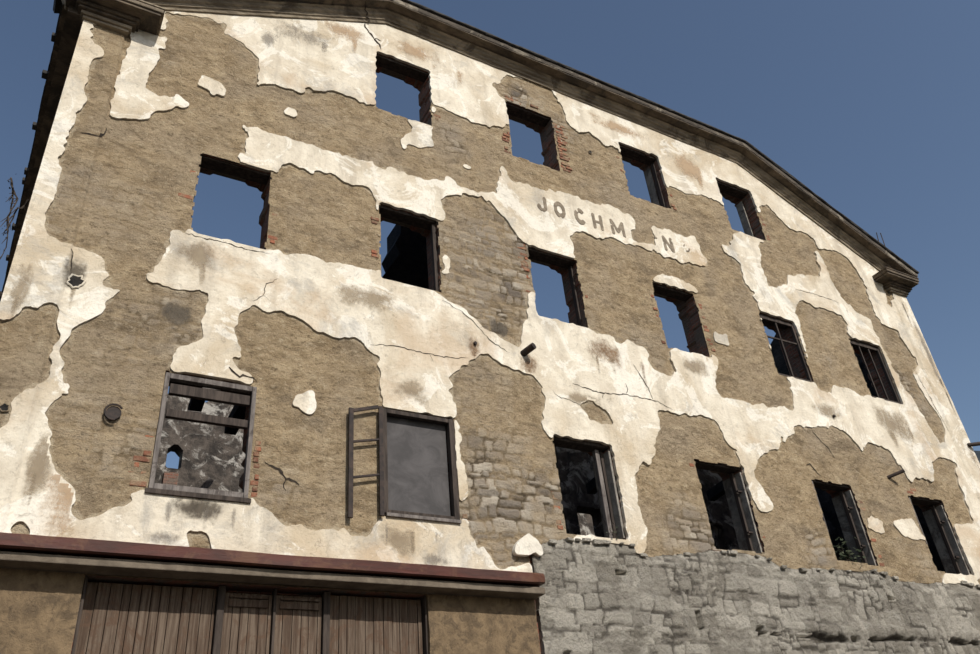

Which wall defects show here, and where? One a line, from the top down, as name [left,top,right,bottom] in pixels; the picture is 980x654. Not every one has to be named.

flaking render [0,13,793,569]
crack [370,344,465,360]
crack [553,367,671,409]
crack [265,462,299,491]
flaking render [635,411,973,584]